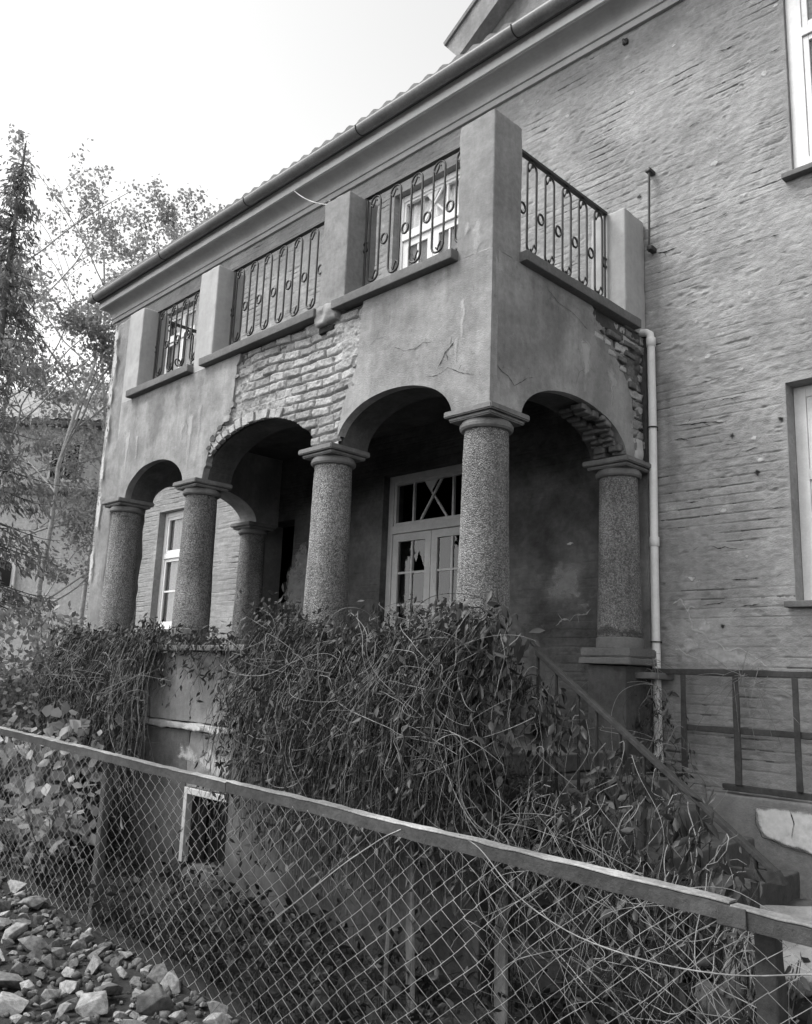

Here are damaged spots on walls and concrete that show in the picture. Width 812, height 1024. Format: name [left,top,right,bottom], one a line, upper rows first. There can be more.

spalling [206,307,363,456]
crack [374,332,471,377]
spalling [593,307,645,461]
spalling [755,809,812,855]